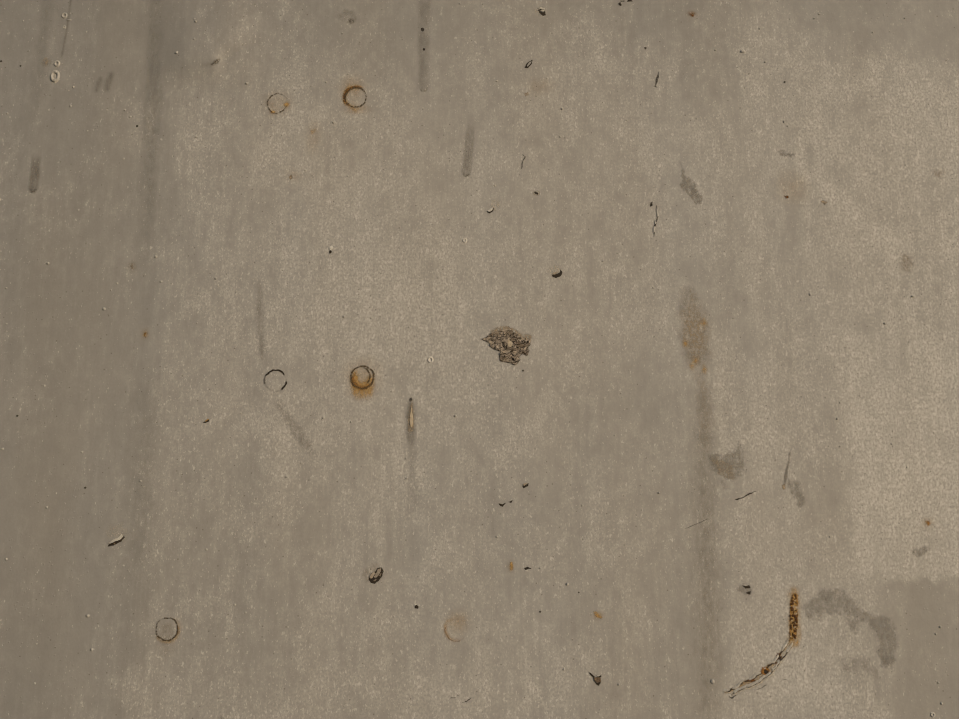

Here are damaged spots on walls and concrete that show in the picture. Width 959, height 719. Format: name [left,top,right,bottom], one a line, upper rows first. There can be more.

peeling [482,326,531,365]
rust [352,368,372,395]
rust [789,593,799,645]